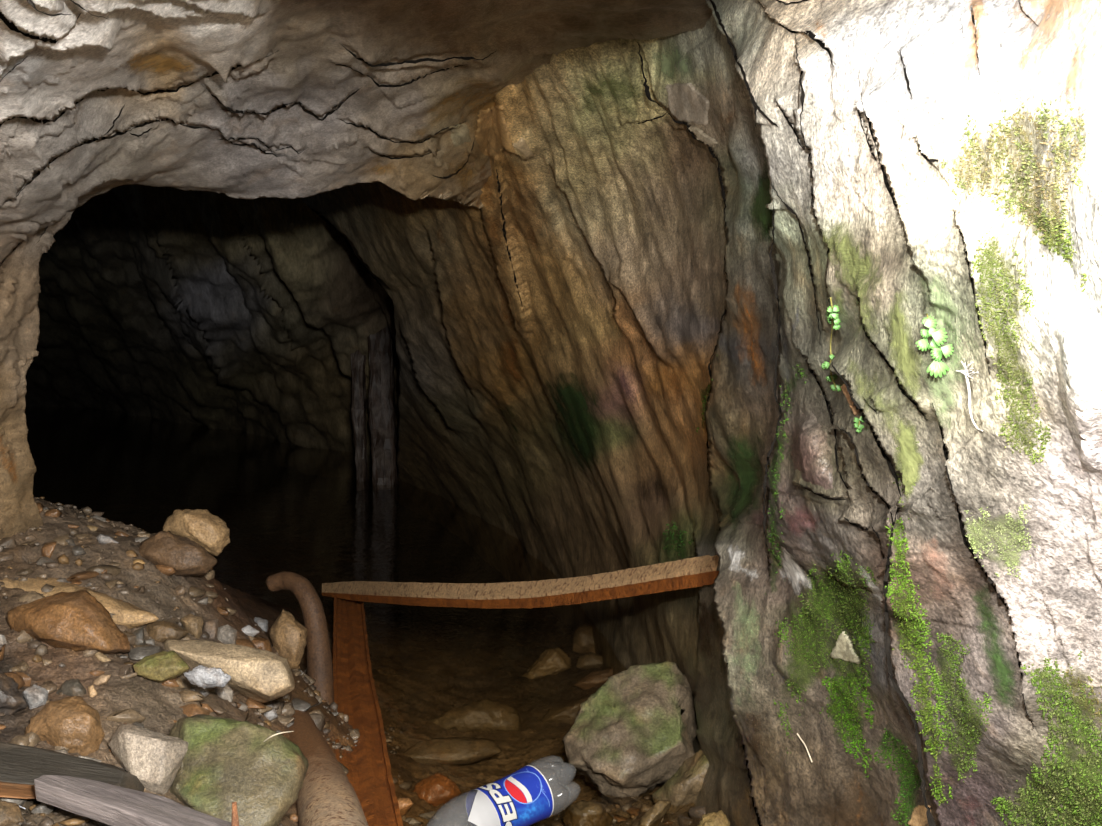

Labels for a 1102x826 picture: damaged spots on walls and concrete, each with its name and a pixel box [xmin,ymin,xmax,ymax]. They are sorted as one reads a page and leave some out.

crack [0,0,107,82]
crack [971,8,980,75]
crack [0,45,524,311]
crack [710,0,939,826]
crack [853,278,1033,725]
crack [952,208,990,375]